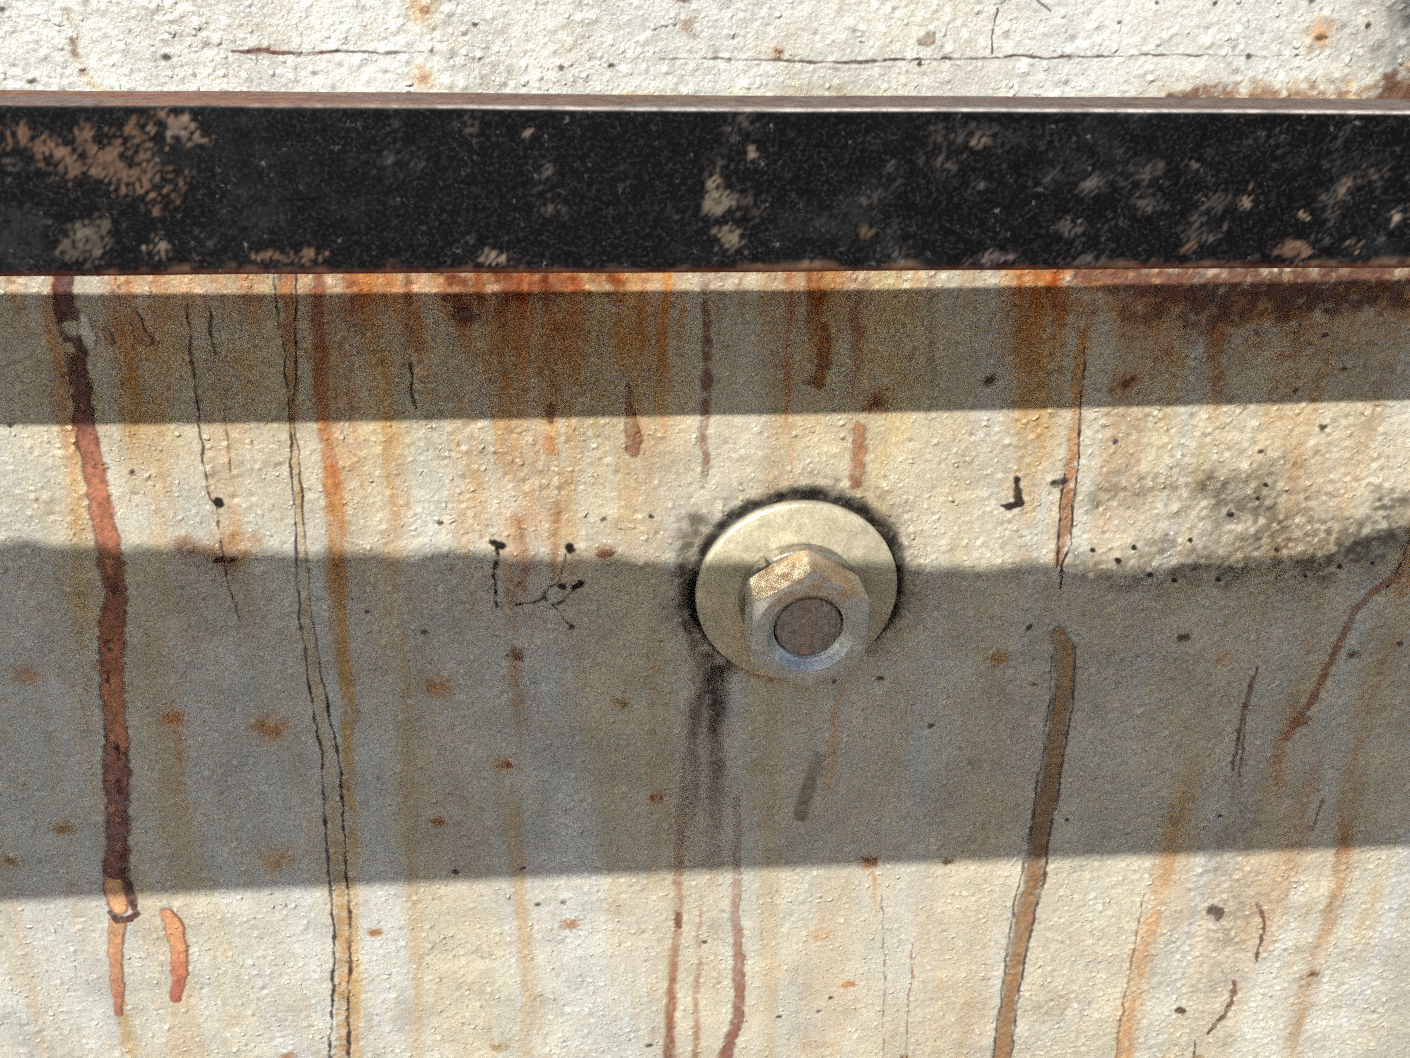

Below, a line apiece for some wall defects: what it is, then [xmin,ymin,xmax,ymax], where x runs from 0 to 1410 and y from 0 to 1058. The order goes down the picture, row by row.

rust [1377,69,1410,99]
rust [273,274,335,565]
rust [625,383,642,456]
rust [700,297,712,473]
rust [1051,349,1086,589]
rust [1074,268,1410,328]
rust [52,276,139,1016]
rust [1284,536,1410,740]
rust [159,909,188,1003]
rust [304,650,352,1058]
rust [719,870,745,1058]
rust [993,627,1076,1058]